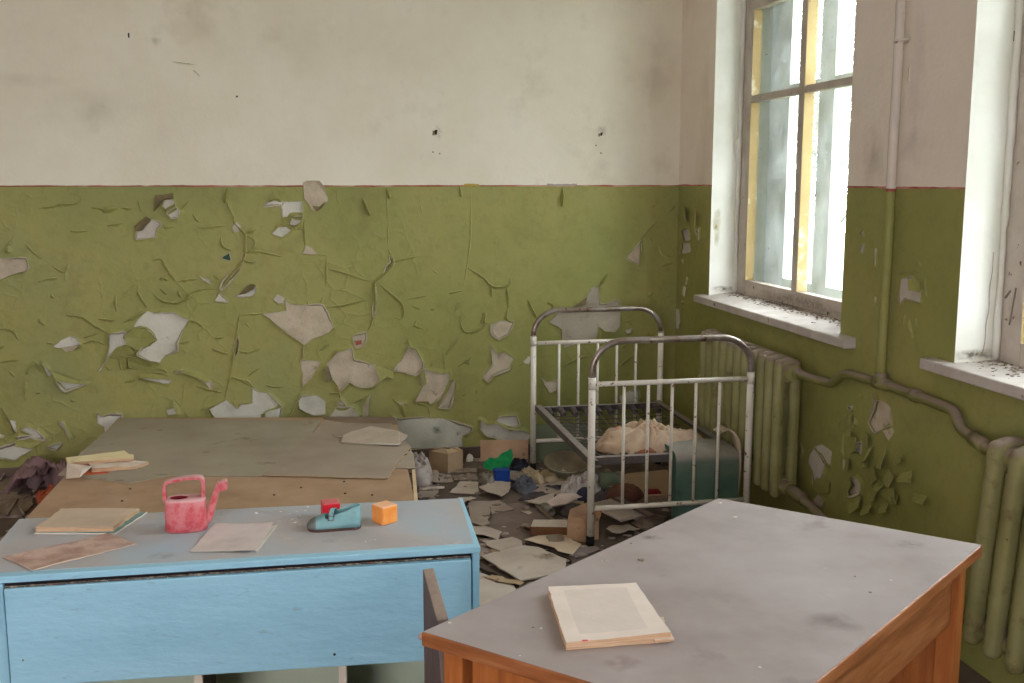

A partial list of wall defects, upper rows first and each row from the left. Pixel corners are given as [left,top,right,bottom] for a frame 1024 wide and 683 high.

peeling [132,193,185,243]
peeling [260,179,329,241]
peeling [0,253,34,286]
spalling [196,251,260,304]
crack [0,193,554,420]
peeling [546,283,634,351]
peeling [897,274,924,309]
peeling [38,292,530,450]
peeling [479,317,562,398]
peeling [614,386,643,403]
peeling [0,416,75,464]
peeling [807,393,927,516]